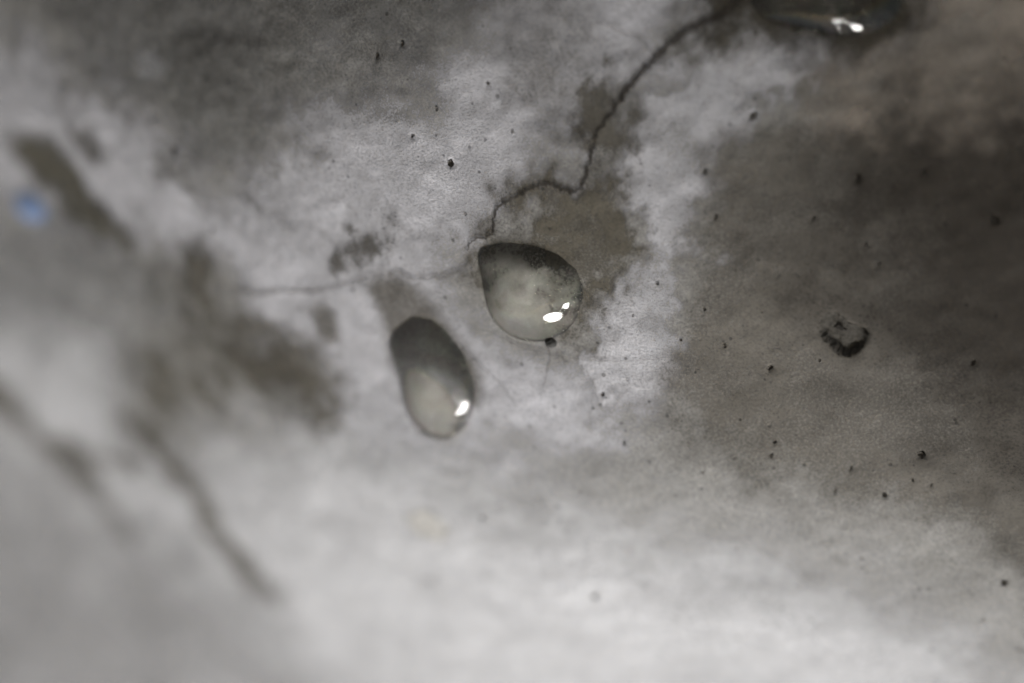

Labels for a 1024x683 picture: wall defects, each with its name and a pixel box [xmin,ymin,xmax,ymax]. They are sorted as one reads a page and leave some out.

crack [467,0,738,251]
spalling [817,311,870,358]